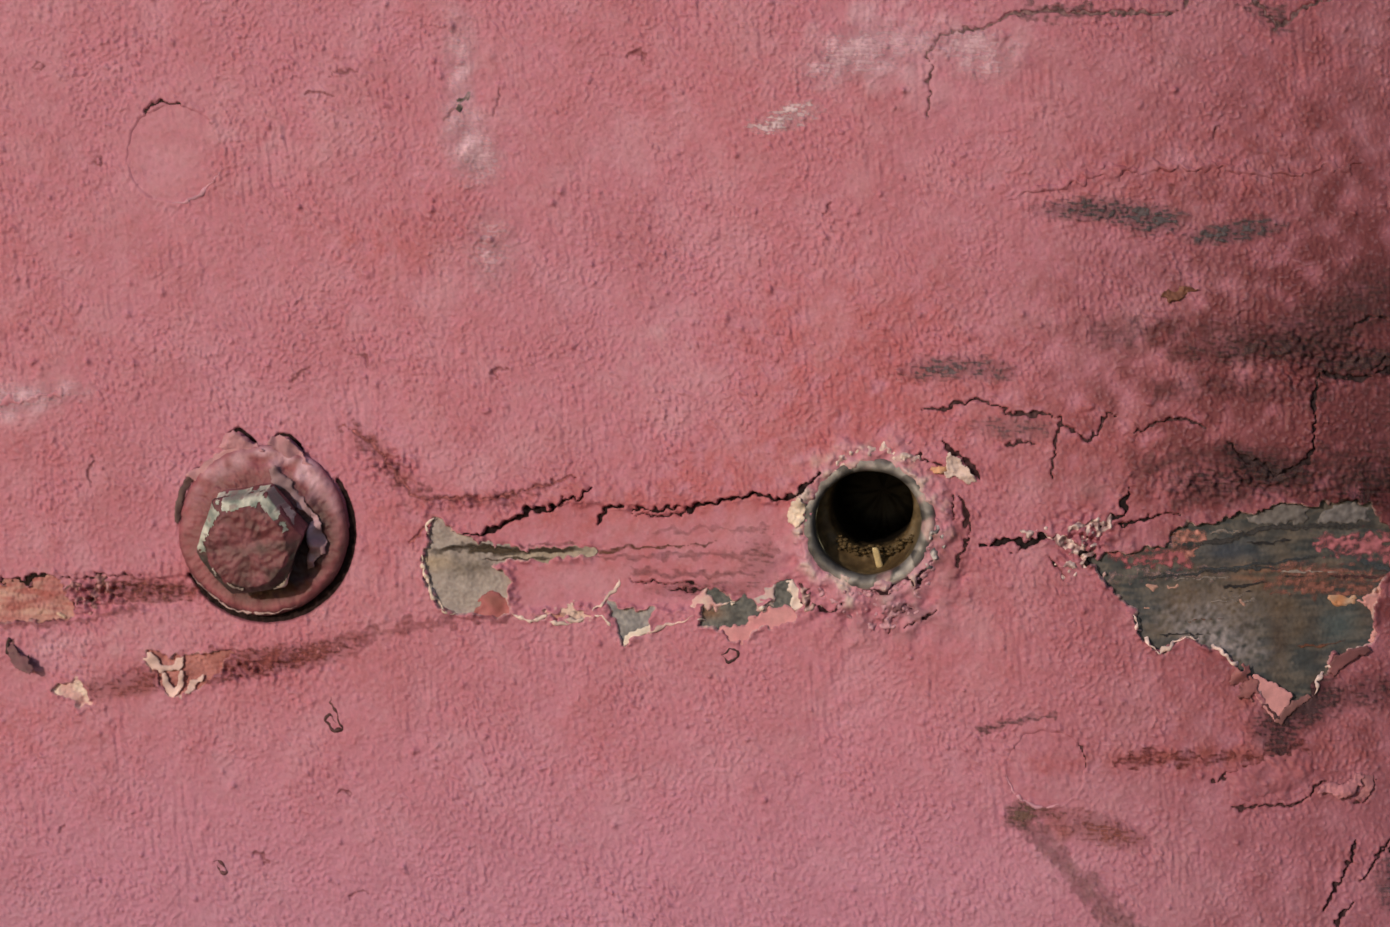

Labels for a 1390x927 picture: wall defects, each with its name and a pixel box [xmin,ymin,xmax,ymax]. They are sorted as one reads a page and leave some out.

crack [925,0,1189,117]
crack [1252,0,1332,31]
crack [338,425,821,543]
peeling [787,497,806,528]
crack [876,357,1390,634]
peeling [0,574,115,674]
corrosion [85,581,195,602]
crack [630,578,706,593]
peeling [420,517,946,646]
crack [799,583,842,613]
peeling [1020,500,1390,725]
peeling [53,677,93,707]